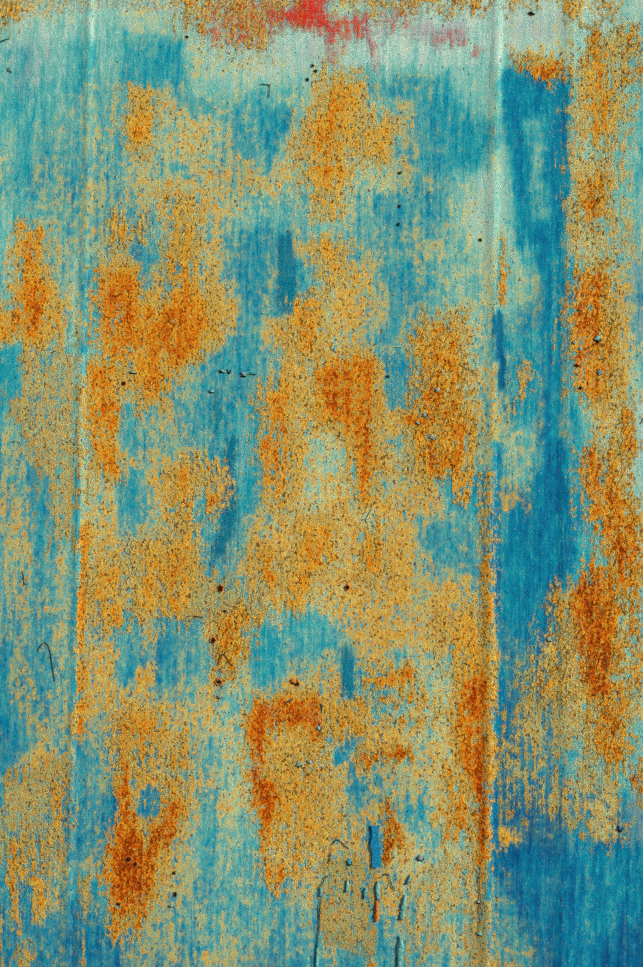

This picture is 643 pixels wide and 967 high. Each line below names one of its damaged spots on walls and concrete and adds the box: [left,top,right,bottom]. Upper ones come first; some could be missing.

corrosion [505,0,643,248]
corrosion [0,209,66,364]
corrosion [70,60,505,902]
corrosion [494,231,512,306]
corrosion [498,356,538,424]
corrosion [516,254,643,792]
corrosion [90,701,196,946]